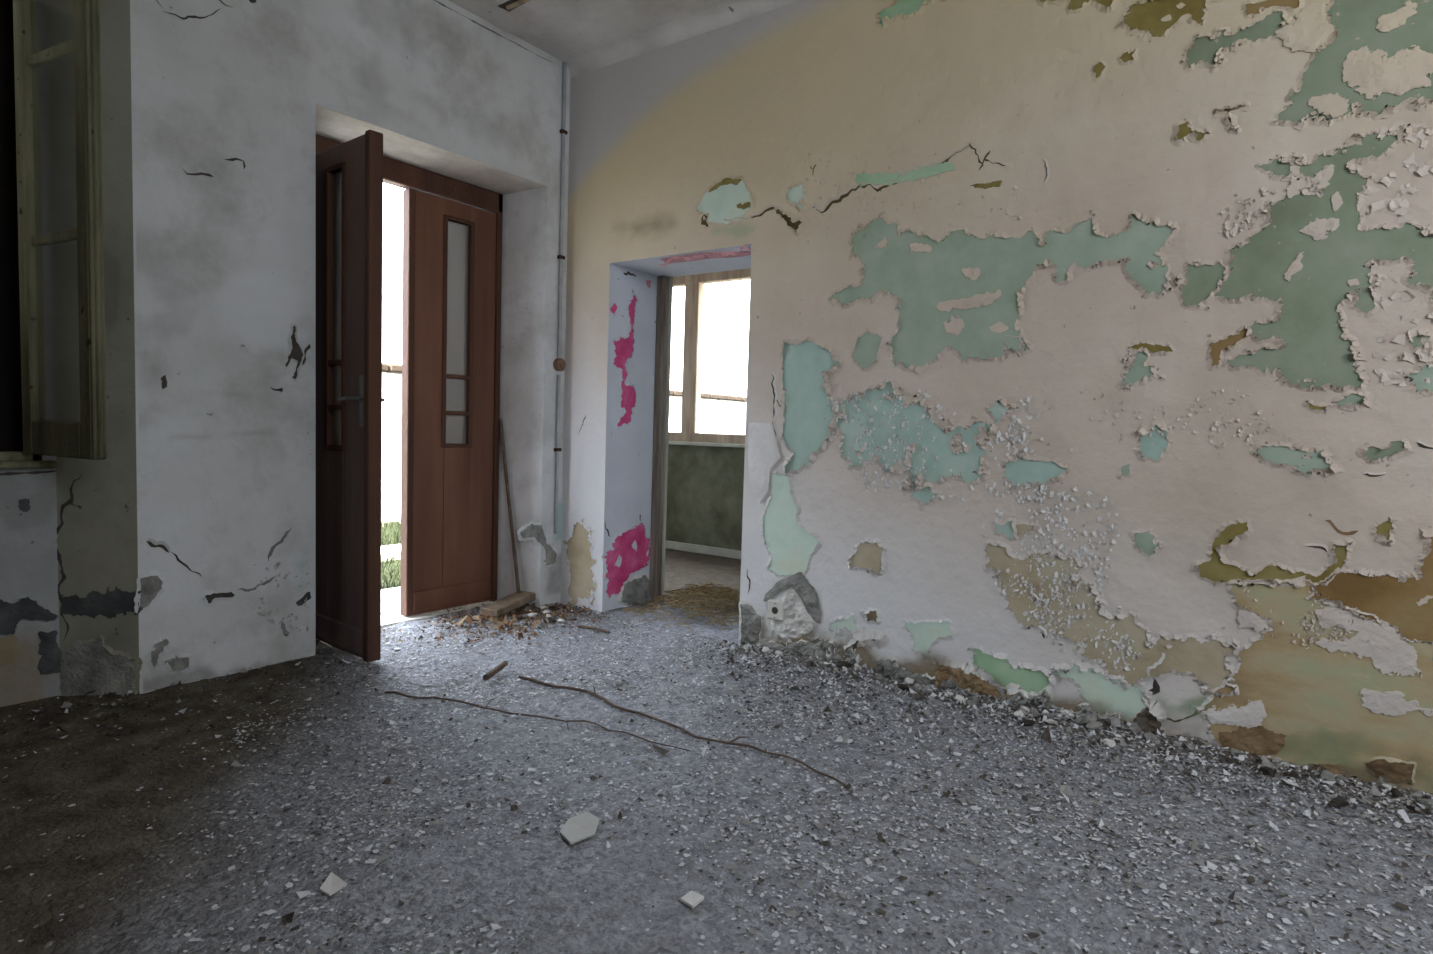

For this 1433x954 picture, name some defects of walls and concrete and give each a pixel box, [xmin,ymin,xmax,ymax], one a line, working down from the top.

crack [156,0,233,20]
crack [434,0,556,65]
spalling [495,0,531,12]
peeling [694,174,756,230]
peeling [660,251,751,264]
peeling [610,280,651,429]
peeling [735,0,1433,813]
peeling [18,498,31,516]
crack [146,538,202,577]
crack [238,527,292,592]
spalling [0,570,193,696]